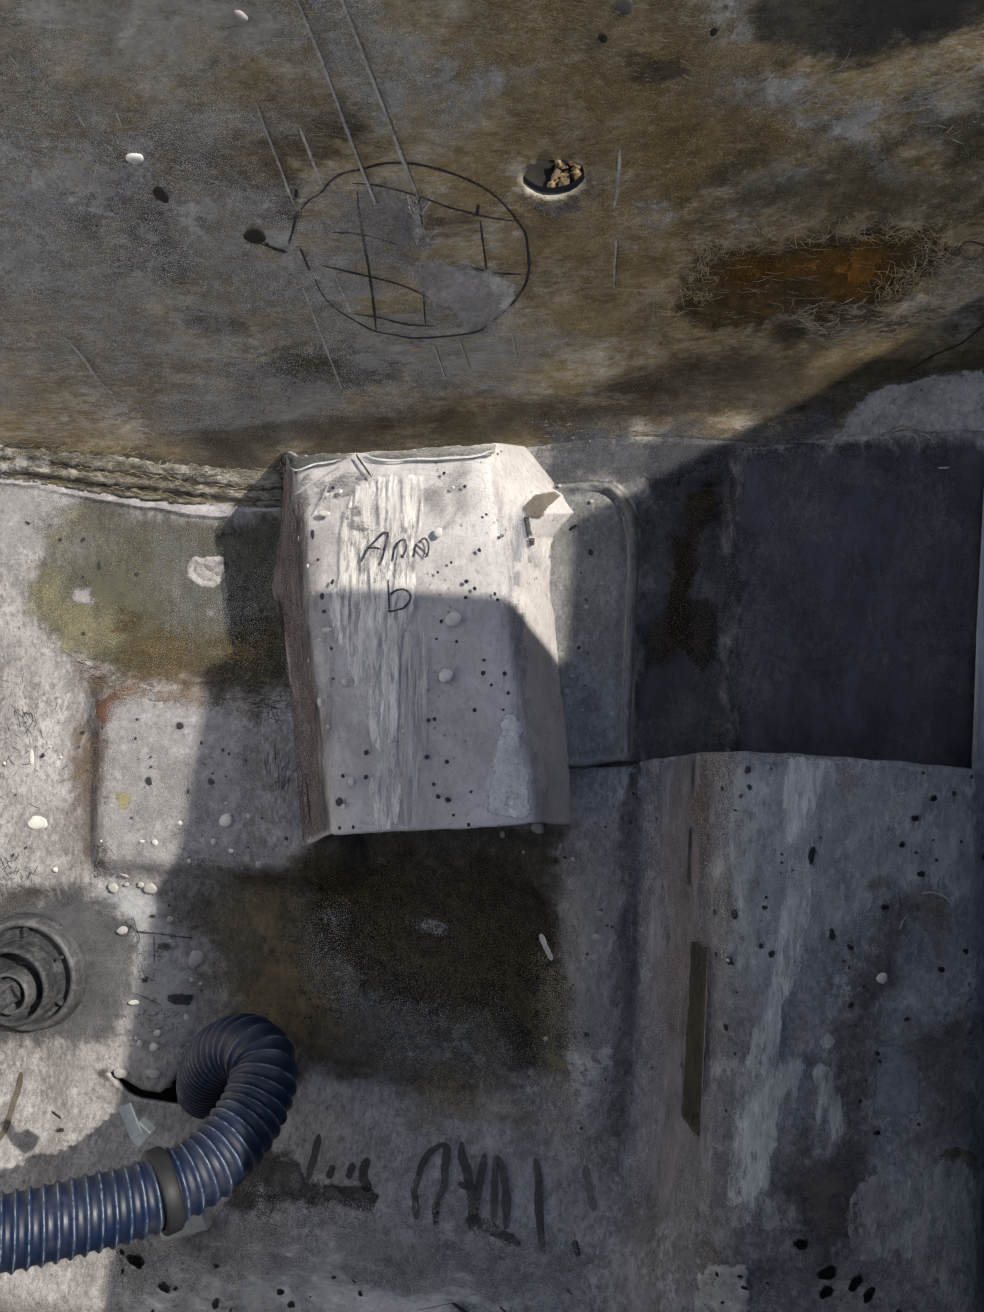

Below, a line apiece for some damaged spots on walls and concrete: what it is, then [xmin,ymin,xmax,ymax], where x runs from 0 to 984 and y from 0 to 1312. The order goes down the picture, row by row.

leakage [0,340,984,703]
peeling [735,360,984,453]
leakage [161,826,573,1102]
peeling [694,1260,750,1312]